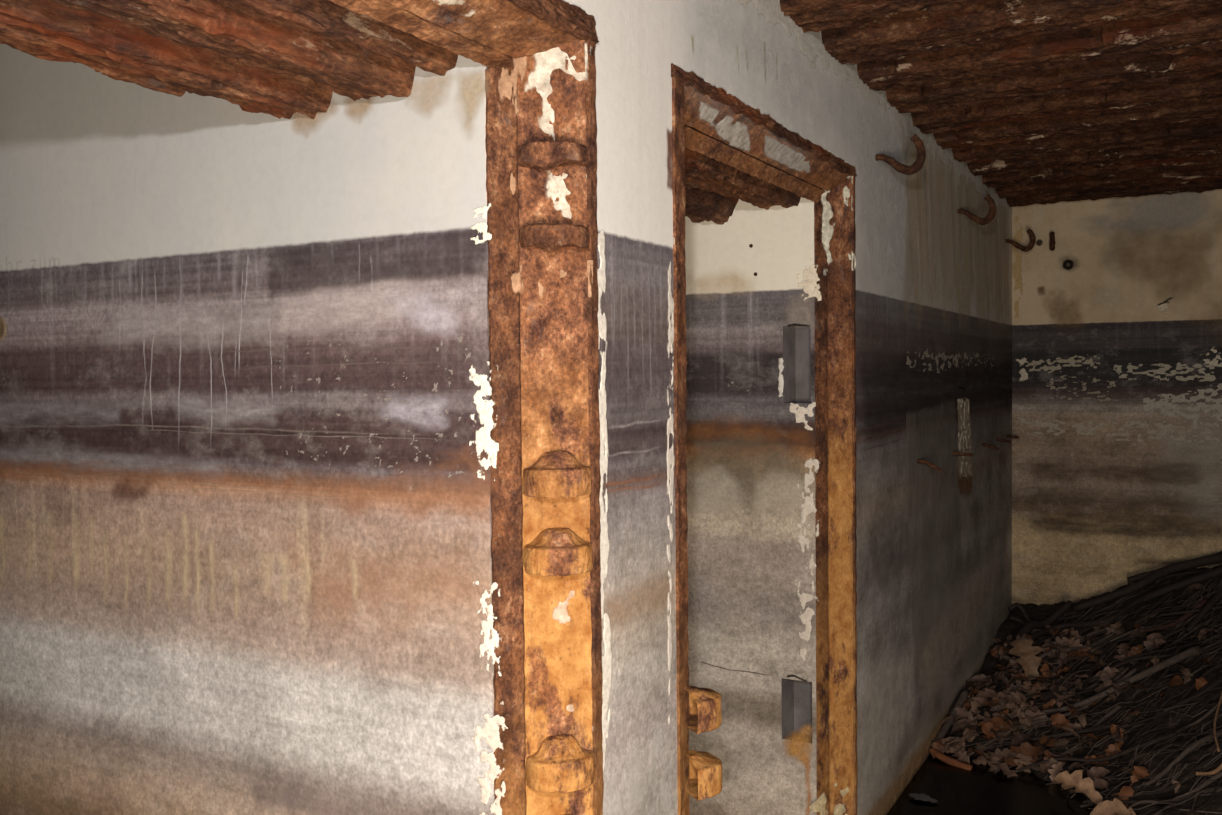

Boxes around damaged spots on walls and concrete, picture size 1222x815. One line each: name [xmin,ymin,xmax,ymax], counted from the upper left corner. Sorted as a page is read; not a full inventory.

water stain [281,288,452,328]
peeling [906,349,994,373]
peeling [1016,347,1222,445]
peeling [795,458,819,661]
peeling [473,581,502,676]
peeling [471,701,508,815]